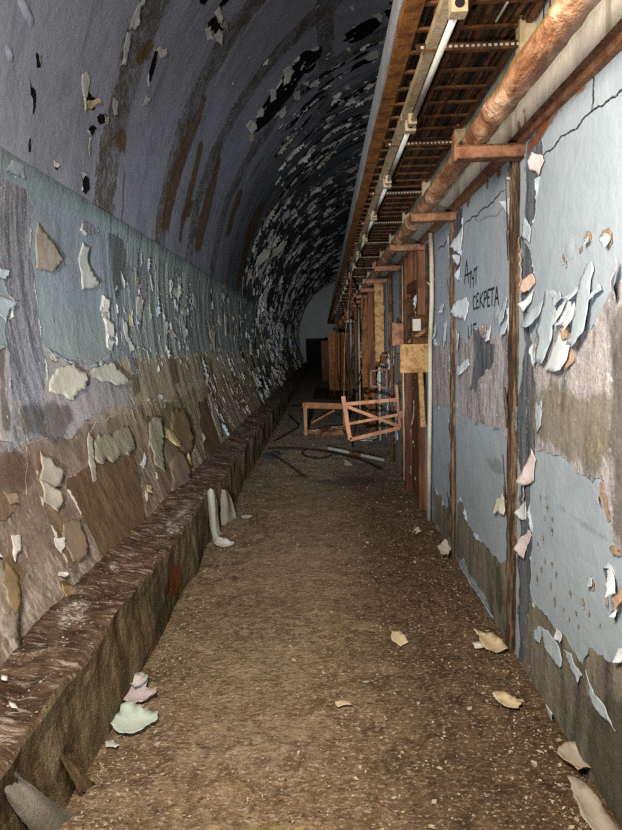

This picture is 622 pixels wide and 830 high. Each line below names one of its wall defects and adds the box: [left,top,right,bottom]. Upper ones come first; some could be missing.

crack [543,76,622,155]
peeling [0,0,393,597]
peeling [376,351,399,444]
peeling [432,129,622,829]
peeling [0,534,27,667]